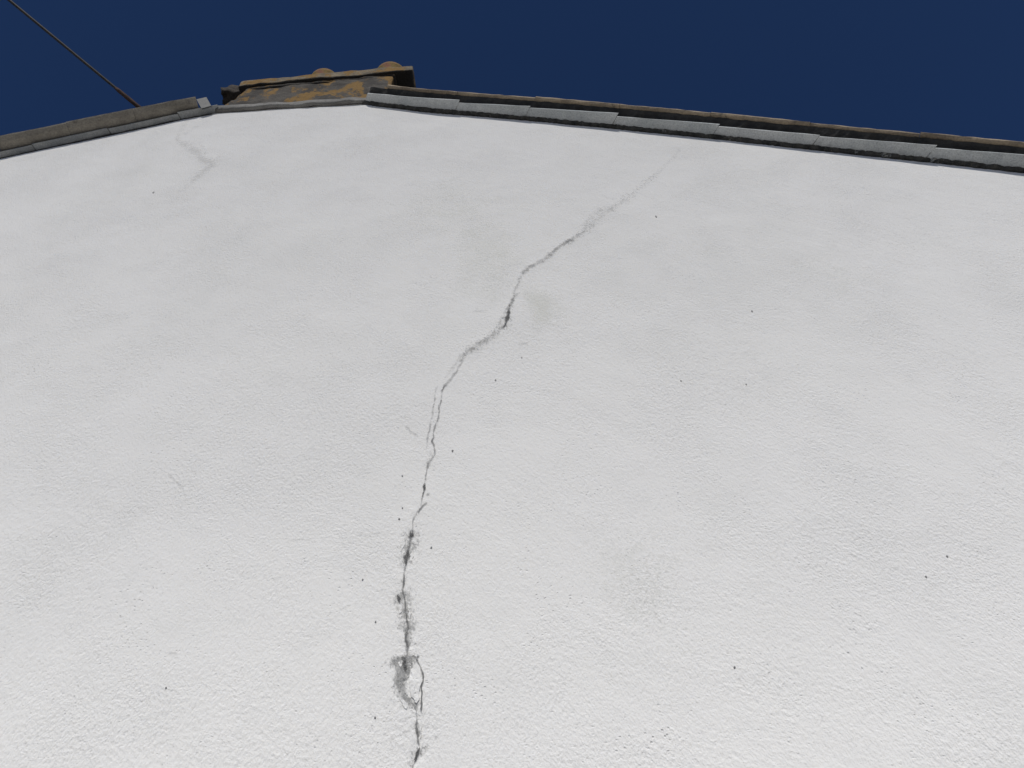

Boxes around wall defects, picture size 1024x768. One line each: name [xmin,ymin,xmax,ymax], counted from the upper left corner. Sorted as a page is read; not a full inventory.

crack [390,438,434,768]